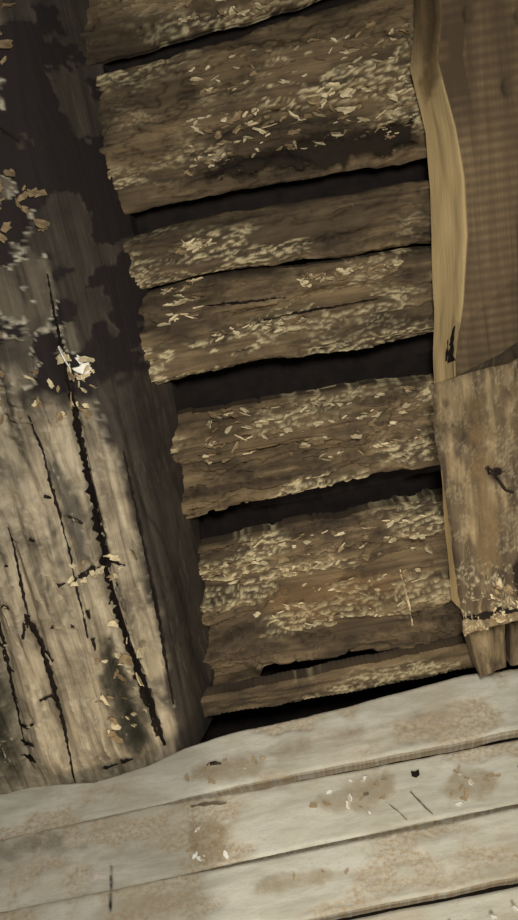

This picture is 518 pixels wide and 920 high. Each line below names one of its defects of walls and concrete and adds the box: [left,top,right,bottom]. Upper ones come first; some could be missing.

crack [0,274,174,783]